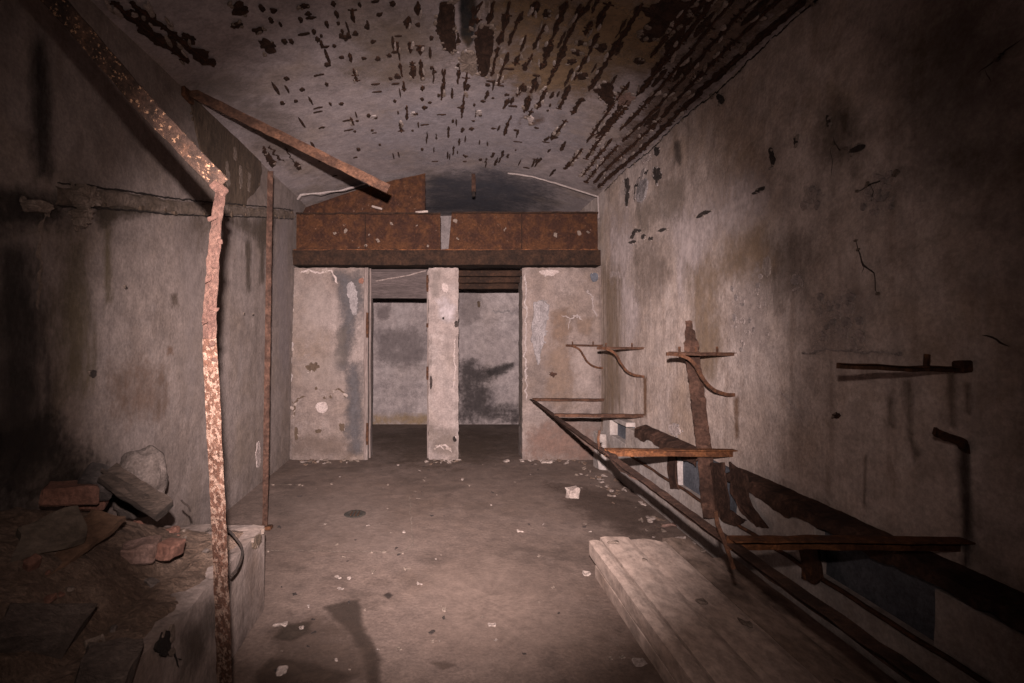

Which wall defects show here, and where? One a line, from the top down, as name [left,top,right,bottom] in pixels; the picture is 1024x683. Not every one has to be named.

spalling [104,0,216,67]
peeling [190,99,277,208]
spalling [227,0,814,207]
crack [853,239,880,295]
flaking render [290,385,348,440]
leakage [306,272,364,454]